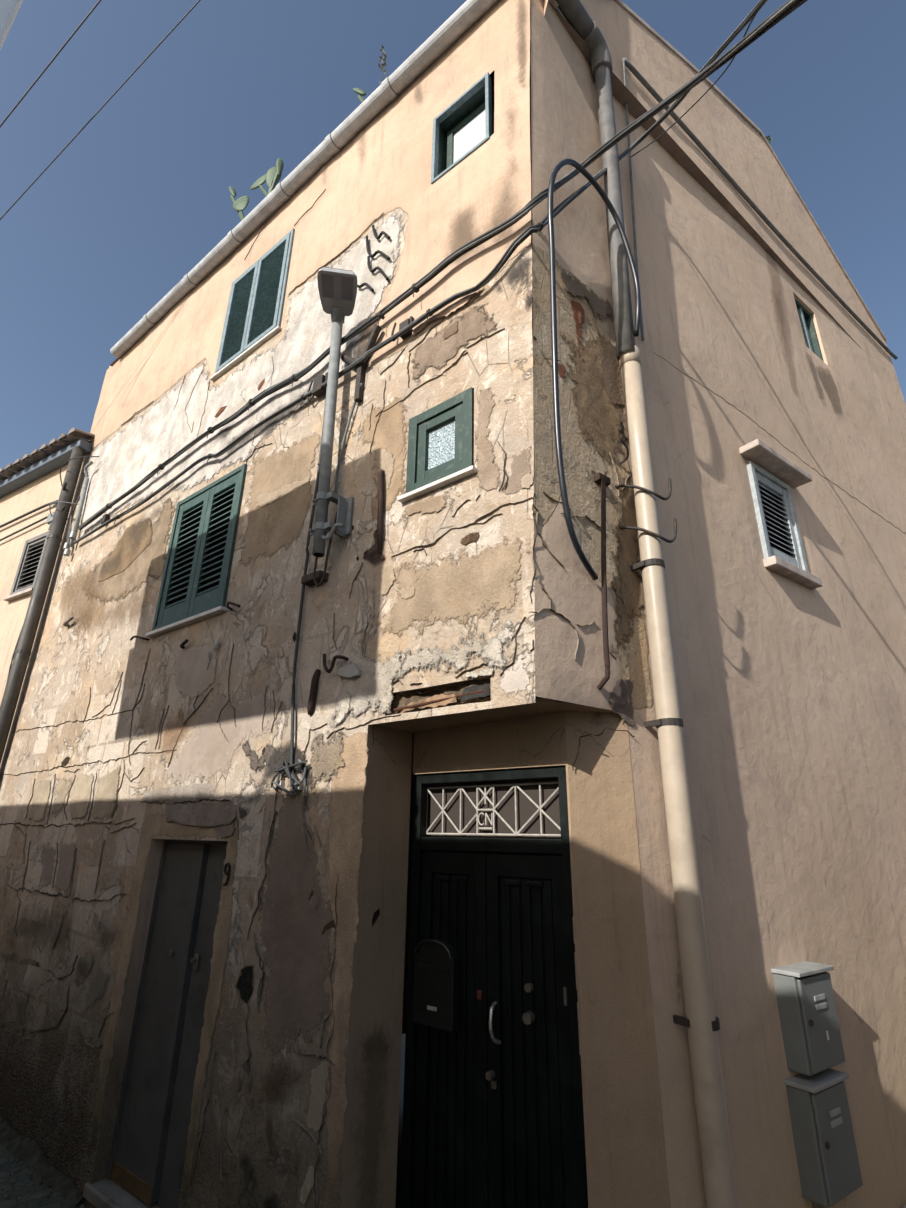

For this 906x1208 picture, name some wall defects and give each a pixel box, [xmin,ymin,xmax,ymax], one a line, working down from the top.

peeling [79,213,404,604]
crack [609,452,632,496]
rust [369,551,384,564]
crack [391,441,601,678]
peeling [141,387,533,838]
crack [333,562,368,656]
crack [0,644,400,1208]
peeling [306,1060,328,1132]
peeling [299,1166,314,1205]